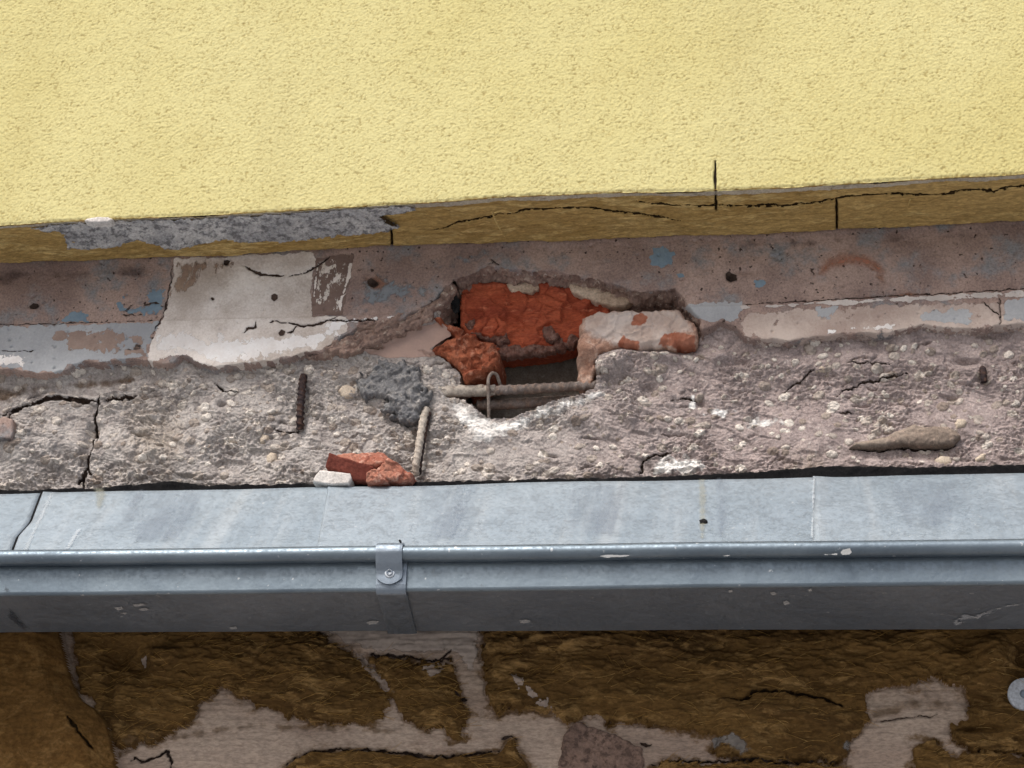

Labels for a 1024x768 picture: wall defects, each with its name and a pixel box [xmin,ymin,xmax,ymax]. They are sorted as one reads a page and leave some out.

crack [434,161,1024,230]
spalling [0,206,1024,491]
crack [784,369,814,393]
crack [837,361,907,415]
crack [2,395,136,488]